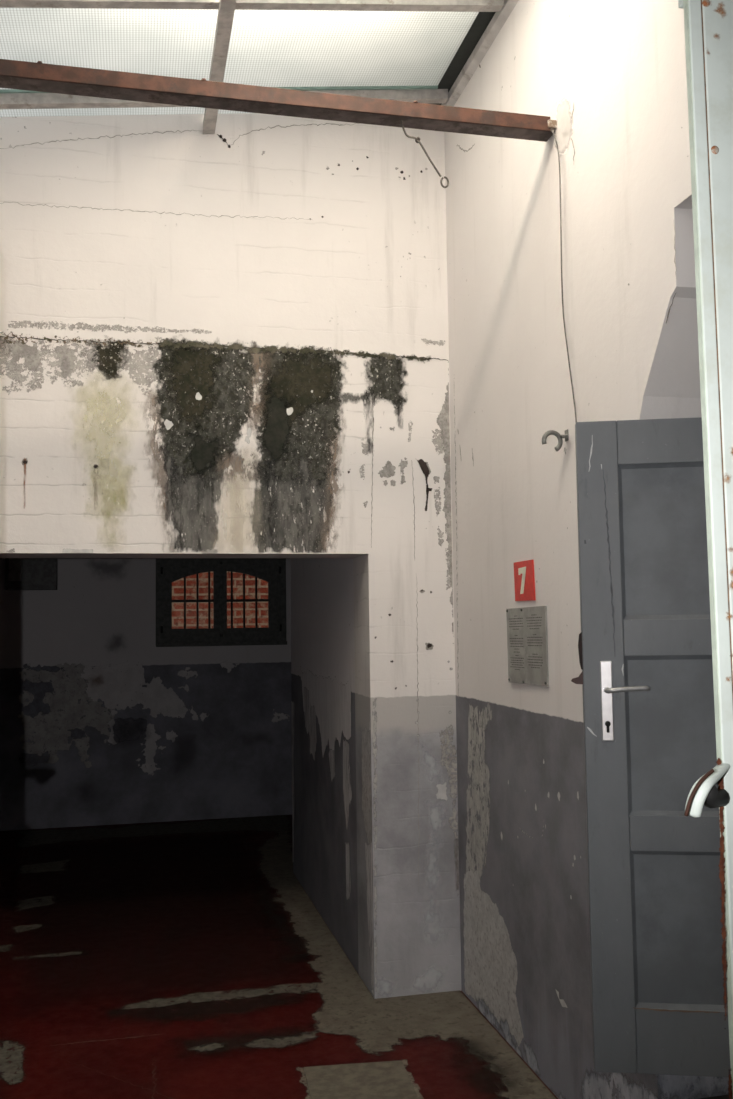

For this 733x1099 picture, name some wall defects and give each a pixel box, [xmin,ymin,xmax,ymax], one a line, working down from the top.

crack [0,123,360,149]
crack [0,202,323,220]
water stain [148,339,407,553]
peeling [18,661,209,775]
peeling [122,666,564,1099]
corrosion [718,806,727,1029]
peeling [0,924,83,959]
peeling [0,1040,25,1085]
peeling [582,1071,729,1099]